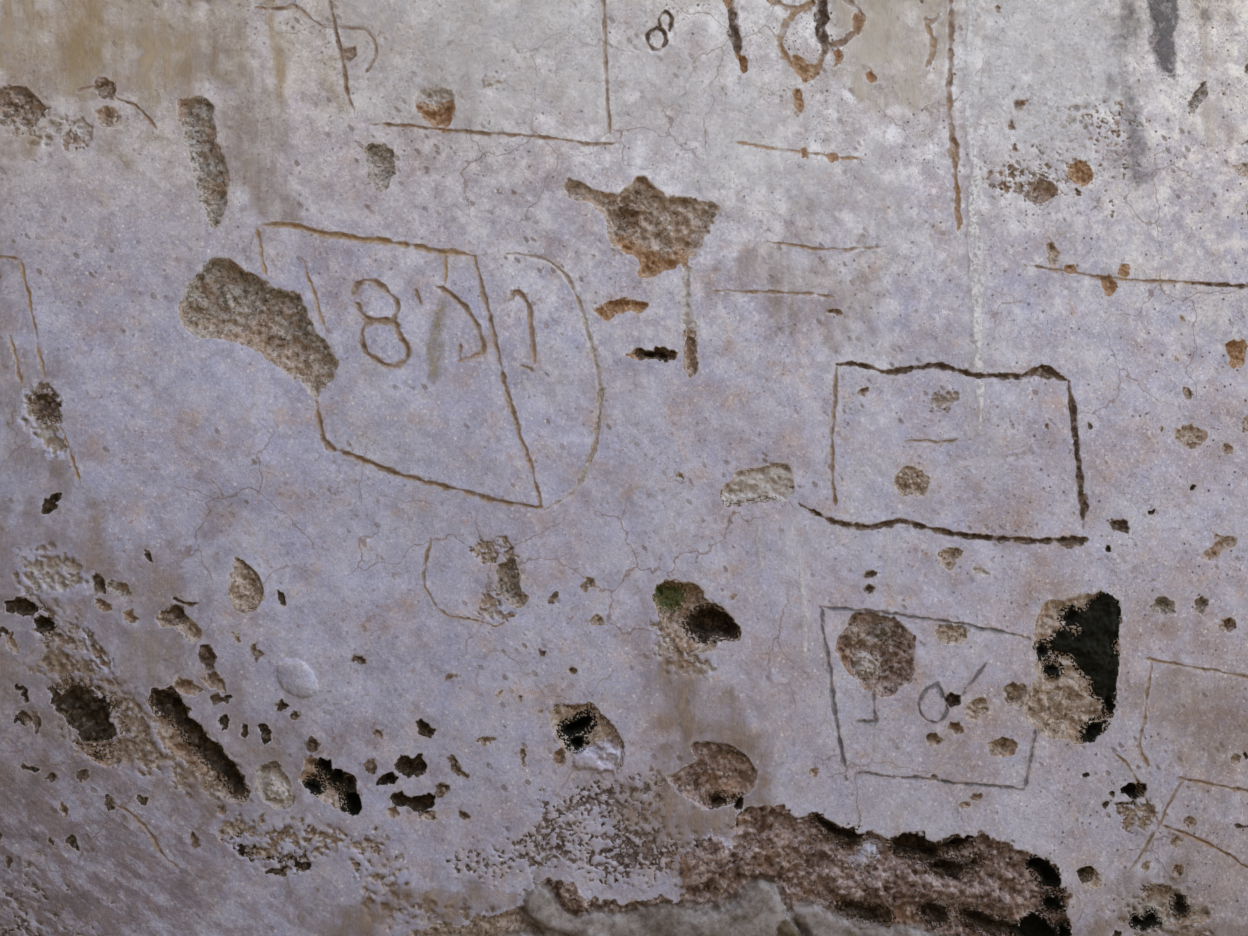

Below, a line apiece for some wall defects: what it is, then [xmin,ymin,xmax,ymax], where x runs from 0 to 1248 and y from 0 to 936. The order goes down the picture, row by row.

damp [1148,0,1179,76]
spalling [169,248,346,409]
spalling [552,169,729,385]
spalling [818,302,852,324]
damp [963,0,1135,435]
spalling [1219,331,1248,376]
spalling [0,362,1248,936]